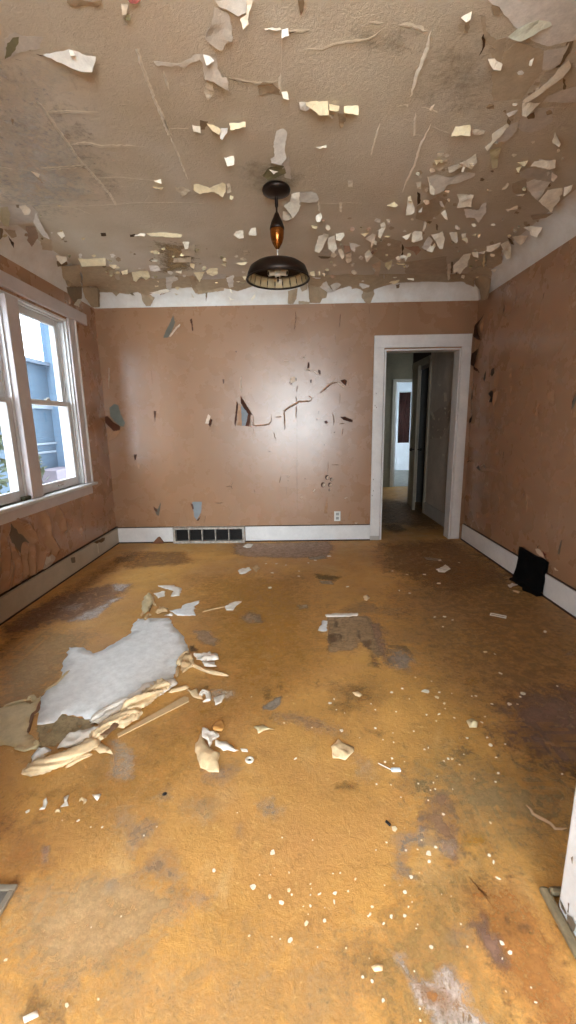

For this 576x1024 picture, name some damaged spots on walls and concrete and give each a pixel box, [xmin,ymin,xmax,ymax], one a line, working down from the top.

peeling [121,0,141,21]
peeling [3,32,96,72]
peeling [154,0,253,100]
peeling [192,120,246,140]
peeling [271,0,576,304]
peeling [0,204,257,307]
flaking render [192,502,202,520]
flaking render [9,523,29,553]